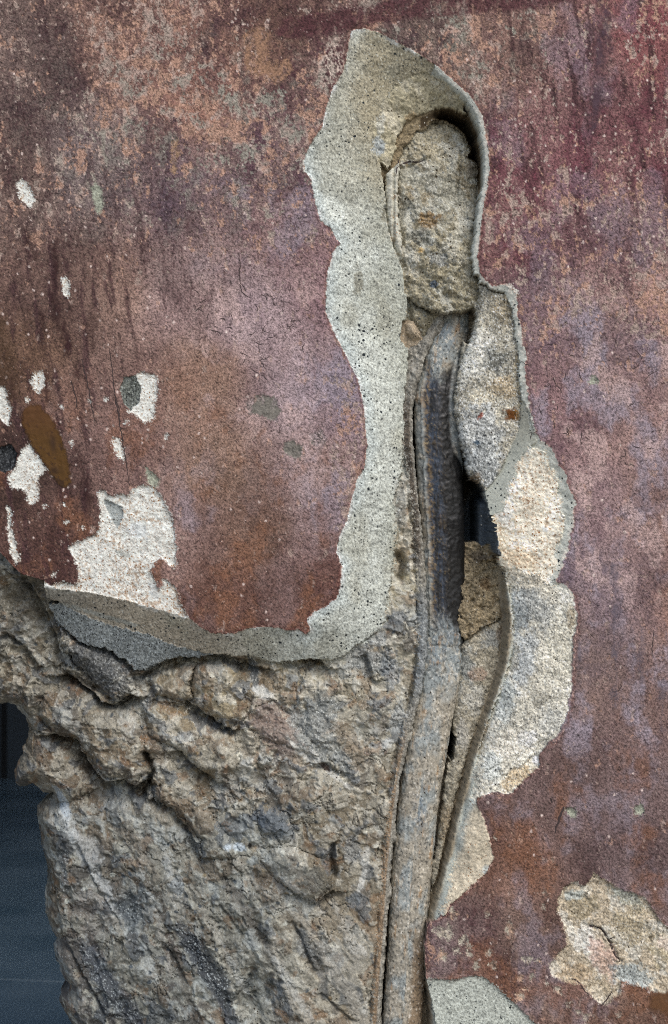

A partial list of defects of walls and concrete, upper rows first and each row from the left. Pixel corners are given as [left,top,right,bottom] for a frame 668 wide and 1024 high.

peeling [16,179,35,208]
peeling [0,386,12,426]
peeling [25,371,46,402]
peeling [0,444,47,509]
corrosion [22,405,71,487]
peeling [7,506,21,564]
spalling [44,25,578,1024]
spalling [521,872,668,1024]